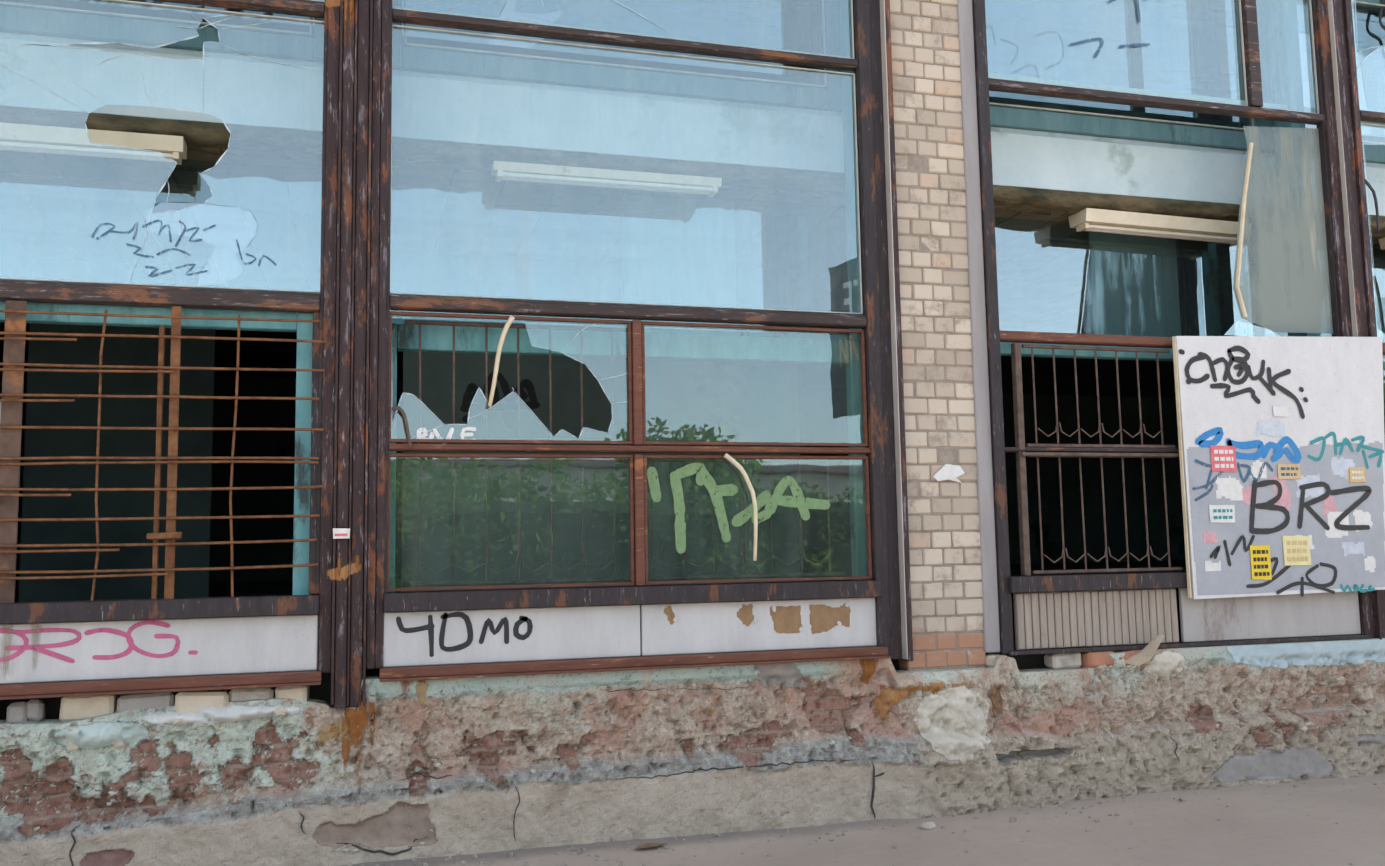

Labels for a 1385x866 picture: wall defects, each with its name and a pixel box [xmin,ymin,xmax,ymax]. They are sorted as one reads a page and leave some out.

rust [327,555,362,582]
peeling [737,602,851,634]
flaking render [1124,634,1164,666]
rust [860,659,1002,721]
peeling [1185,639,1385,747]
spalling [0,721,320,837]
rust [319,699,375,774]
spalling [313,722,535,852]
crack [512,785,520,841]
spalling [553,731,596,775]
crack [601,759,885,818]
crack [68,832,76,866]